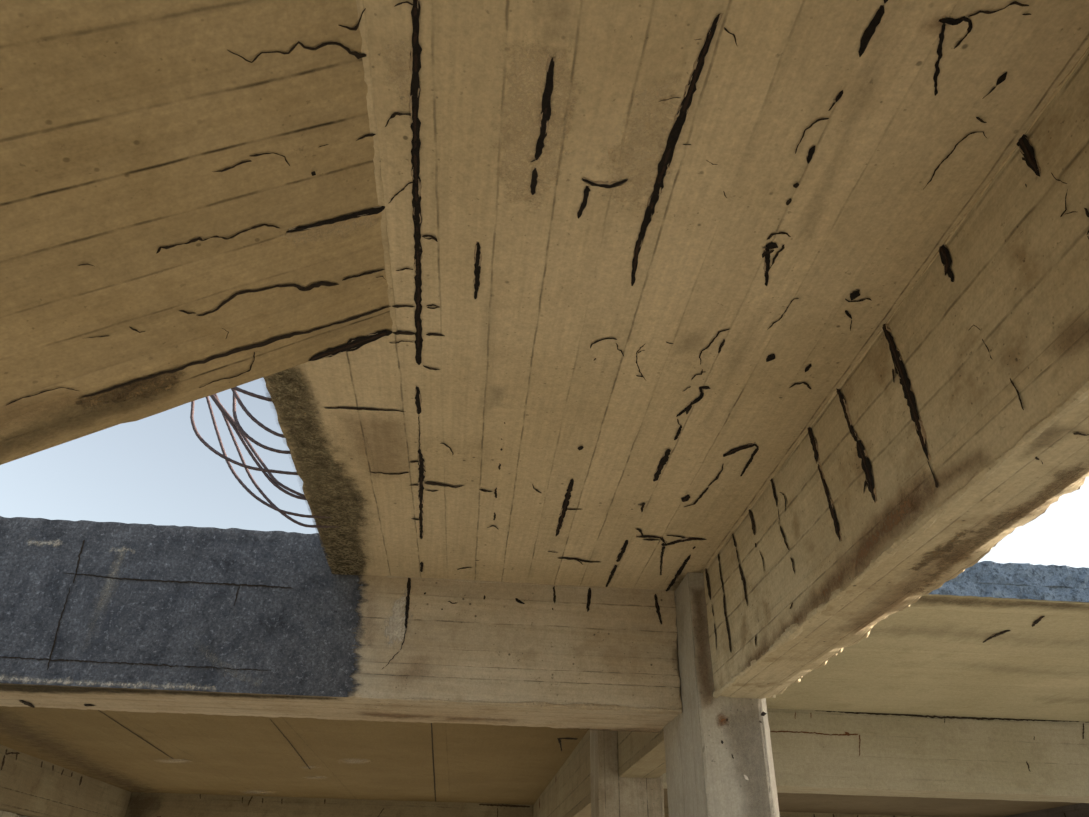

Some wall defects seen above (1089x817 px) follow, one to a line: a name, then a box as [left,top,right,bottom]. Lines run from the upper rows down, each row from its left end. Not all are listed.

crack [228,8,367,63]
crack [214,153,290,172]
crack [156,224,280,254]
crack [705,478,795,652]
damp [779,468,960,636]
damp [918,597,1089,609]